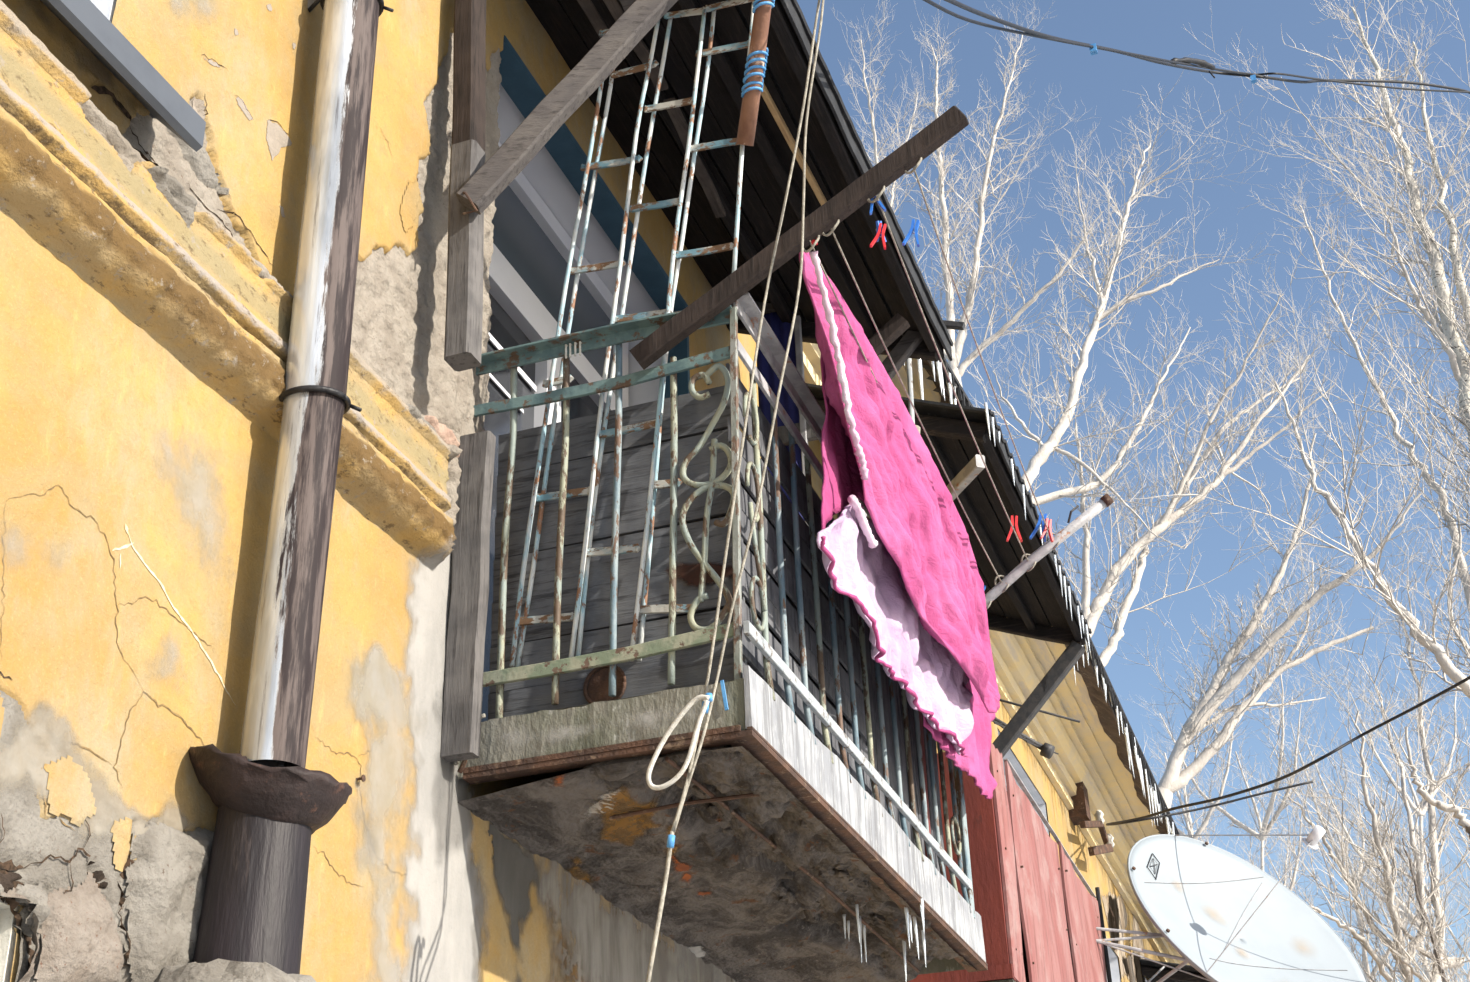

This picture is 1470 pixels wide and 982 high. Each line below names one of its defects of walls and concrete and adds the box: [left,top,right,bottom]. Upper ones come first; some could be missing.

spalling [81,96,245,246]
peeling [236,96,292,161]
spalling [485,48,502,163]
spalling [255,260,293,298]
spalling [351,32,496,526]
corrosion [666,563,733,587]
crack [0,484,213,785]
spalling [0,690,27,750]
spalling [0,755,158,982]
corrosion [597,788,710,896]